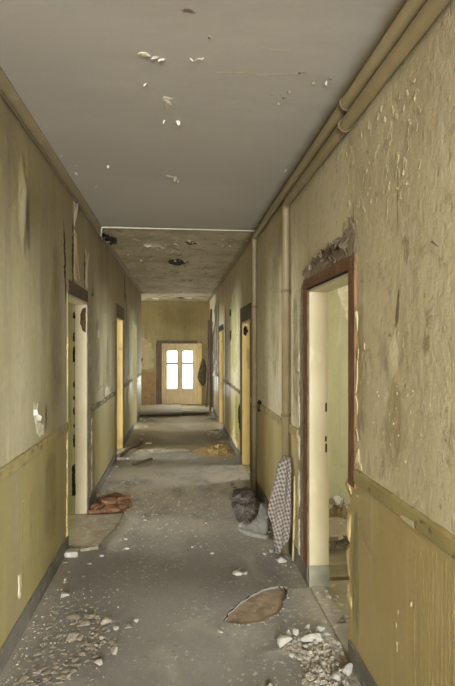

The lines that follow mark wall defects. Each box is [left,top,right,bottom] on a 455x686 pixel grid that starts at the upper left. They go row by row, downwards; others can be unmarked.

crack [63,219,93,304]
spalling [100,233,197,267]
spalling [297,78,420,560]
peeling [33,402,44,437]
spalling [67,303,99,501]
peeling [141,336,155,406]
spalling [66,459,76,537]
spalling [223,548,290,626]
spalling [316,506,352,641]